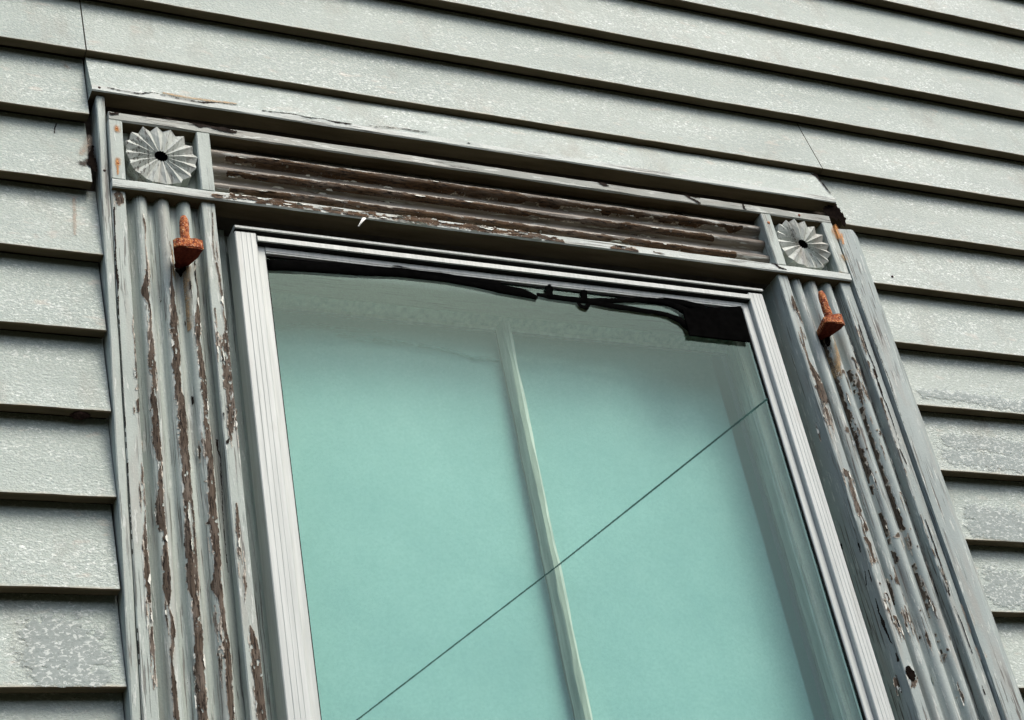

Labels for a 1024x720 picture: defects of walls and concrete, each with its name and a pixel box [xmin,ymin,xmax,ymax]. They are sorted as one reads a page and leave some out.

peeling [211,155,743,259]
peeling [917,388,1024,412]
peeling [132,213,180,720]
peeling [169,213,239,720]
peeling [235,503,247,600]
peeling [791,295,957,664]
peeling [937,433,1024,476]
peeling [963,501,1024,554]
peeling [248,625,267,720]
spalling [893,666,918,696]